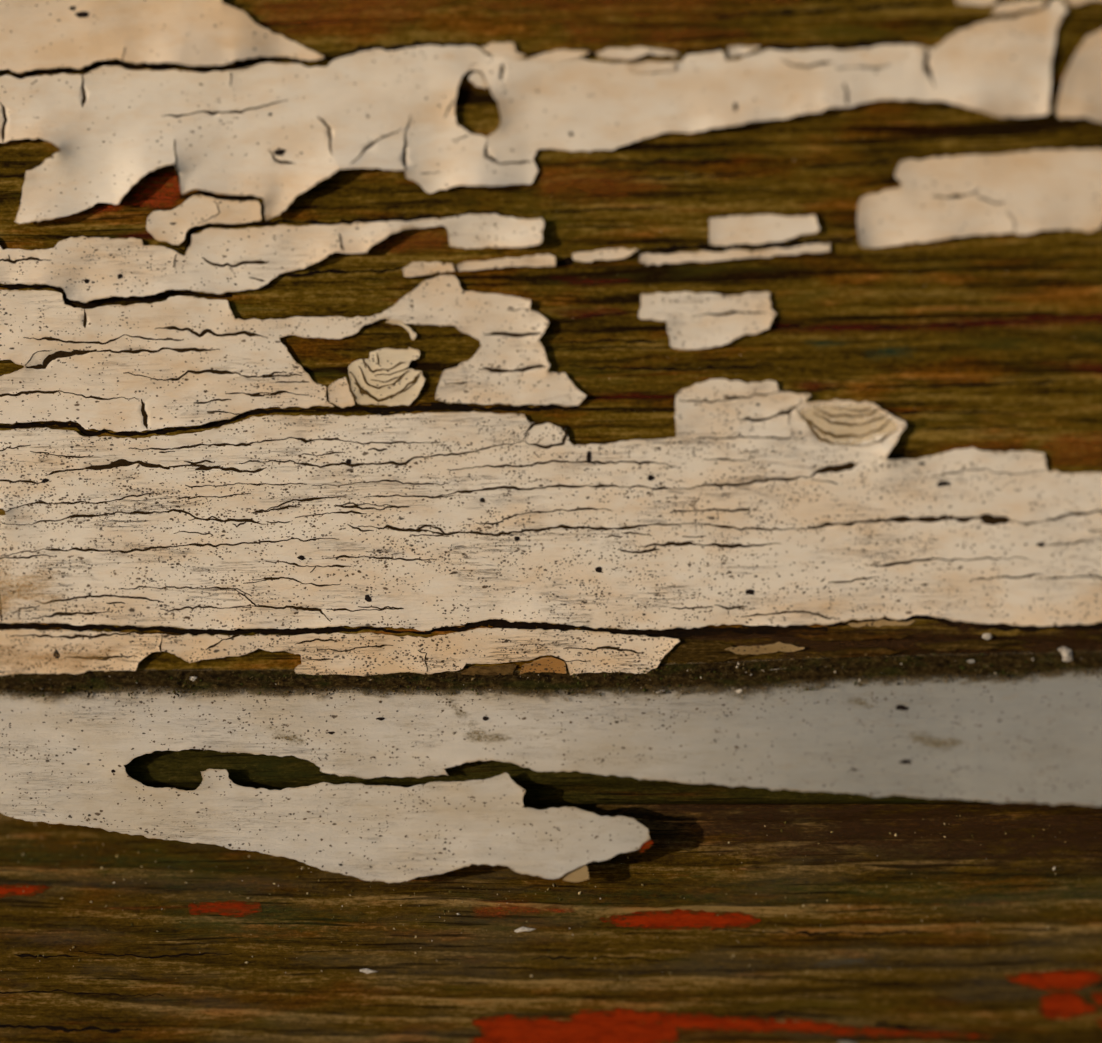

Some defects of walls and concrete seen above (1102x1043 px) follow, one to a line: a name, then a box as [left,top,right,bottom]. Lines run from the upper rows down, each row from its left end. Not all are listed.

peeling [0,0,1102,680]
crack [0,41,1102,676]
crack [684,1,954,105]
peeling [0,669,1102,883]